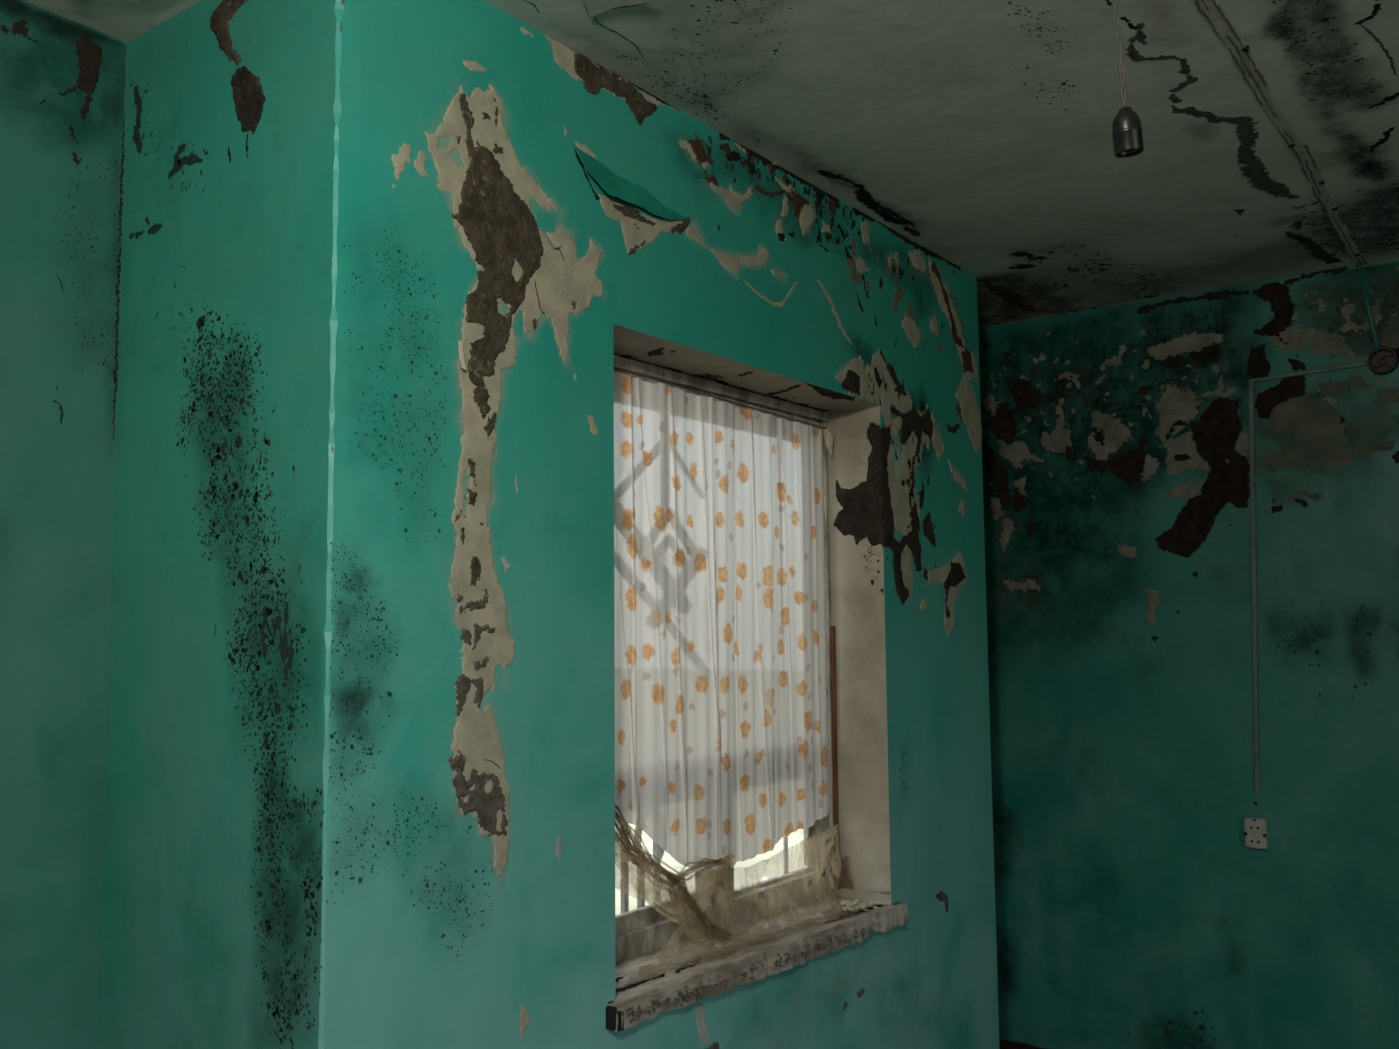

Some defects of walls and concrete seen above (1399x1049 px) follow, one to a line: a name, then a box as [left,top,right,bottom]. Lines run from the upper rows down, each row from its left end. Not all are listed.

spalling [39,36,102,144]
damp [127,73,208,239]
spalling [210,0,266,162]
peeling [520,27,676,125]
crack [1106,0,1367,266]
damp [1269,0,1399,364]
crack [1354,0,1396,75]
spalling [679,133,1399,642]
peeling [391,60,603,884]
damp [151,219,493,1049]
spalling [694,1002,719,1049]